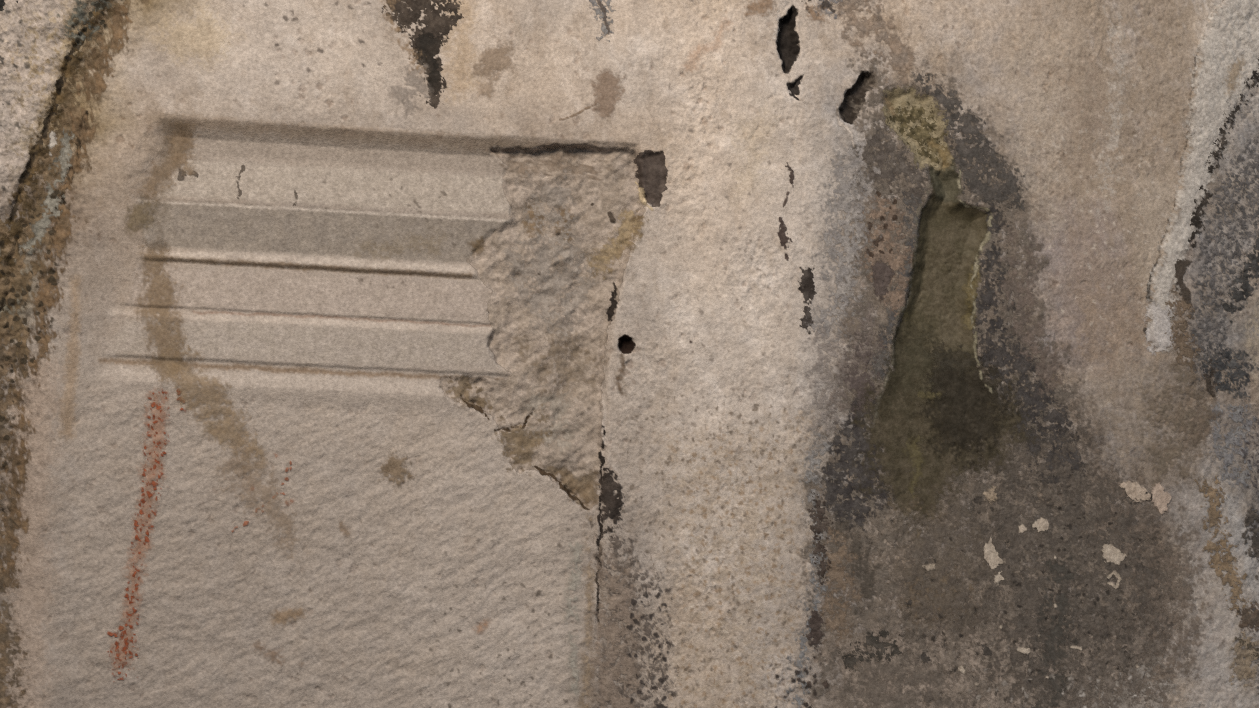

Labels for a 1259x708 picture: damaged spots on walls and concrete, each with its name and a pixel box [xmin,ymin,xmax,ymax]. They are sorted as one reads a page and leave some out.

leakage [382,0,464,113]
leakage [745,0,772,16]
leakage [127,122,194,230]
leakage [0,0,149,708]
leakage [139,242,264,468]
spalling [439,145,668,510]
leakage [775,0,1259,708]